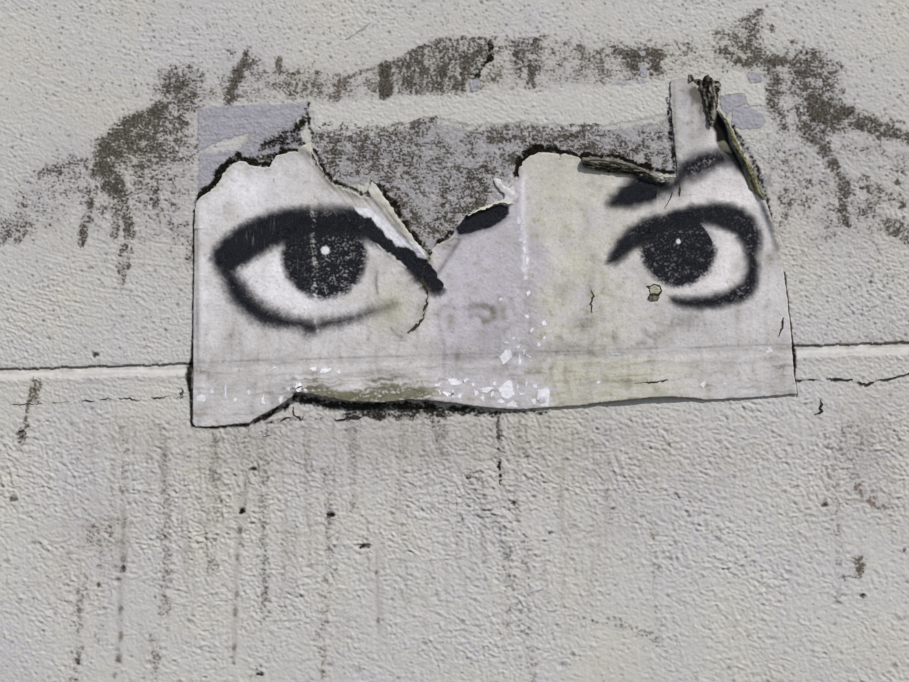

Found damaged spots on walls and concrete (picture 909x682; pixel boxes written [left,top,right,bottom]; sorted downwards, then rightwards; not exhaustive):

peeling [720,71,768,162]
peeling [197,82,677,250]
crack [796,373,909,415]